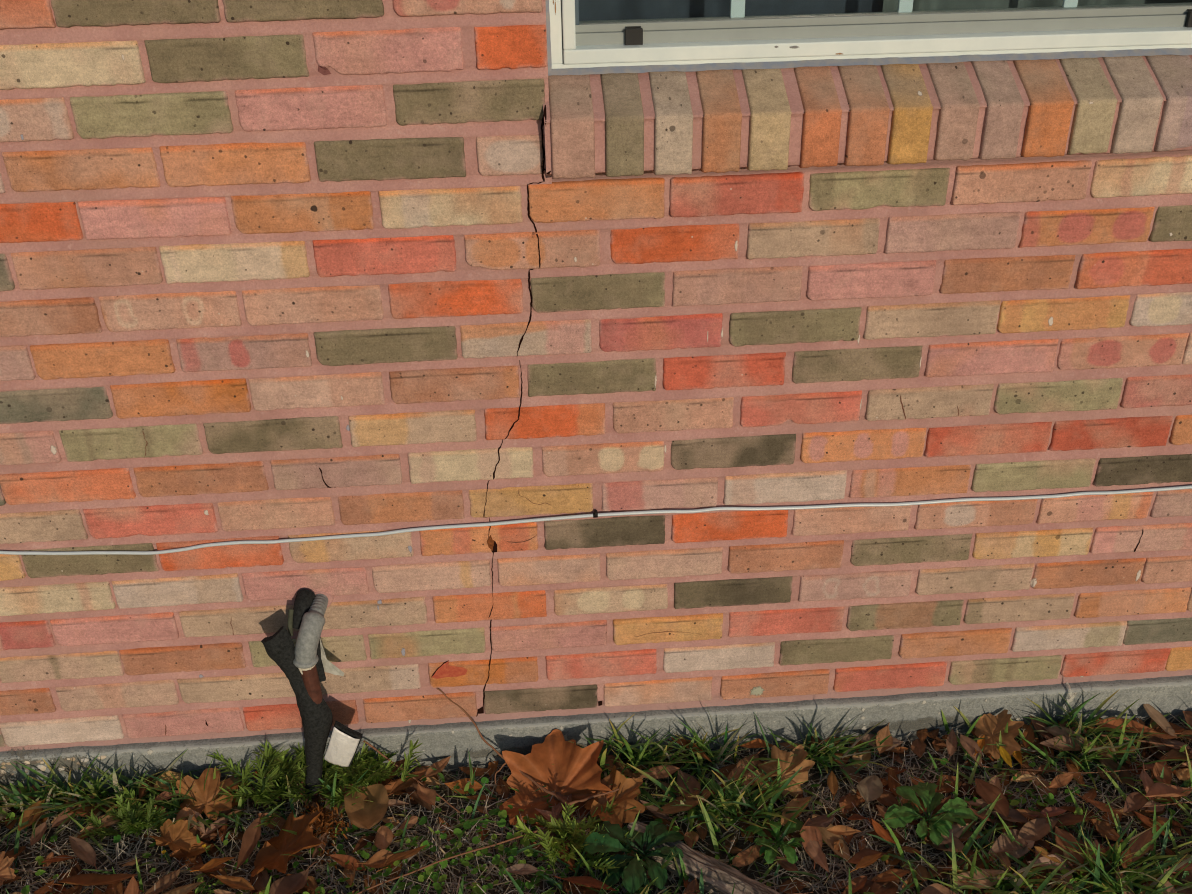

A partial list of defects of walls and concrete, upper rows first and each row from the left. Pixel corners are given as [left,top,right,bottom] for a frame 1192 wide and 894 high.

crack [483,105,551,706]